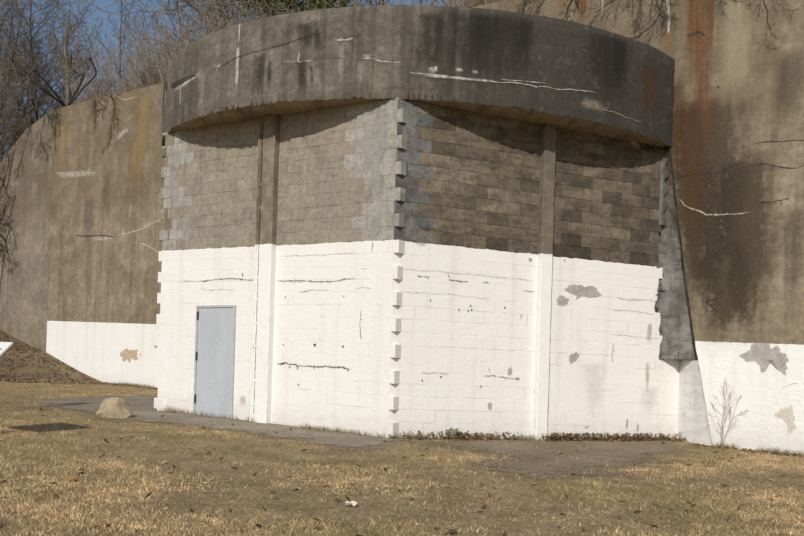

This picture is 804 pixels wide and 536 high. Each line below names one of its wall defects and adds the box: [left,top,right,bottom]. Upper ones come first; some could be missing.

leakage [419,15,592,92]
leakage [666,102,767,323]
crack [76,233,114,241]
peeling [557,284,601,306]
peeling [120,349,141,363]
crack [278,362,349,371]
peeling [739,343,788,375]
peeling [775,406,796,433]